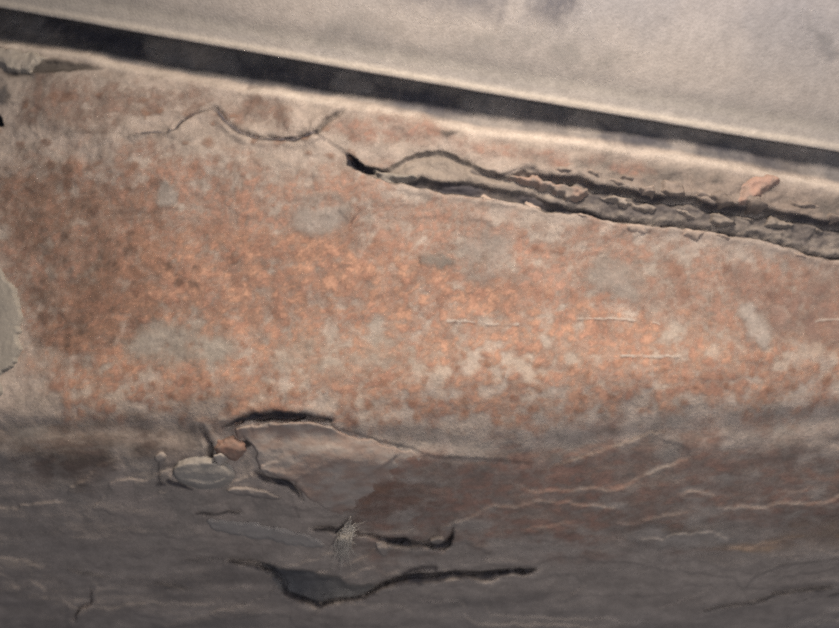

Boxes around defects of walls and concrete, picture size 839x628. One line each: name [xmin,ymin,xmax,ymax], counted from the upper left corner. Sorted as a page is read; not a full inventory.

crack [216,110,323,141]
spalling [346,151,839,260]
peeling [0,268,24,396]
rust [46,224,819,426]
peeling [739,303,769,348]
rust [37,426,111,474]
spalling [172,411,430,515]